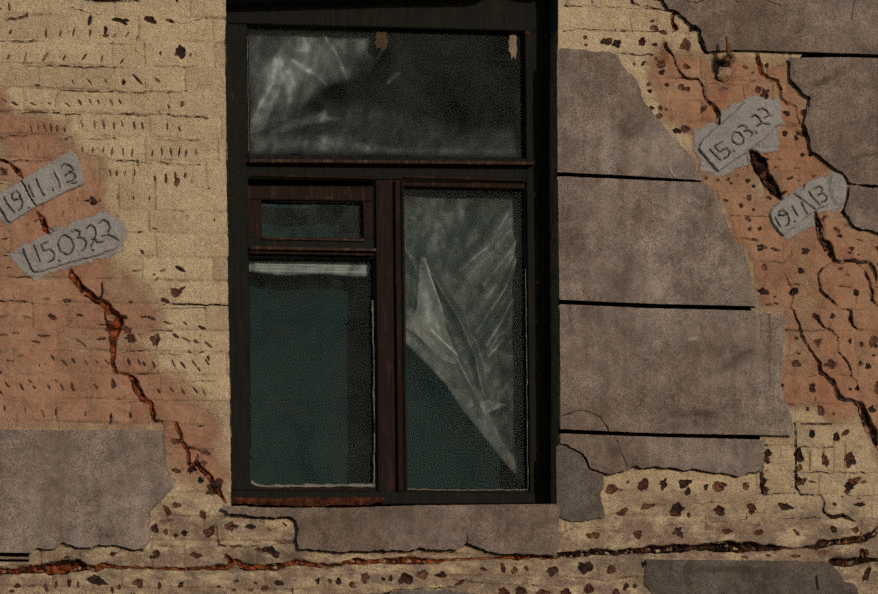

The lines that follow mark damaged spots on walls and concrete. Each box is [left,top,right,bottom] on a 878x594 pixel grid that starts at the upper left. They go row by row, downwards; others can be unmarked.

crack [3,12,38,43]
crack [36,62,121,70]
crack [71,0,139,15]
crack [0,90,210,235]
spalling [557,0,878,388]
crack [735,150,878,449]
crack [0,266,228,503]
crack [0,403,878,594]
peeling [577,562,593,574]